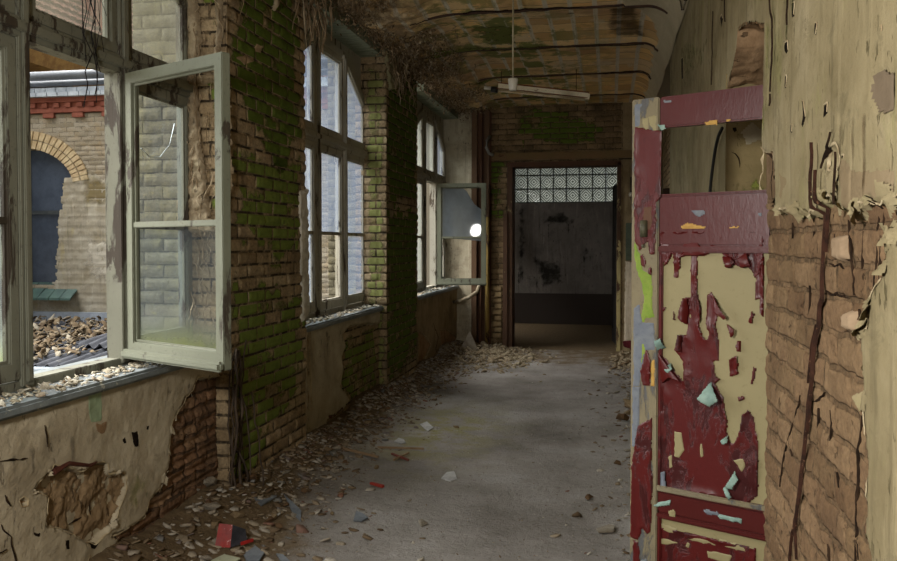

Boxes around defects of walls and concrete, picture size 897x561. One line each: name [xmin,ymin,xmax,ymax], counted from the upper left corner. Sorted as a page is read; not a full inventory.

flaking render [19,374,220,549]
flaking render [623,104,897,561]
crack [779,132,885,561]